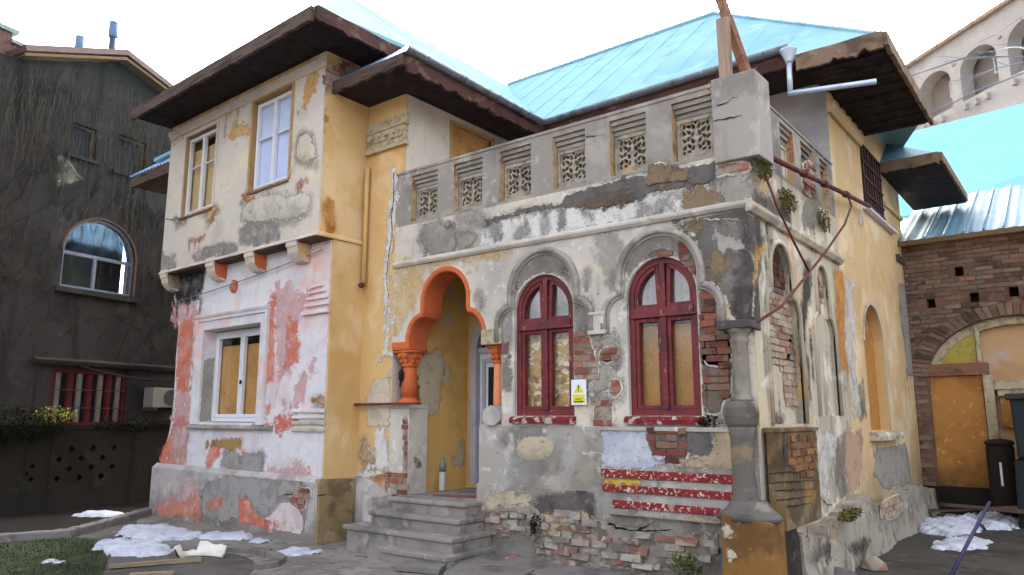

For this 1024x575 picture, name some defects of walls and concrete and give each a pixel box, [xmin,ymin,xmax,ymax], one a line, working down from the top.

spalling [301,60,356,110]
crack [708,88,742,122]
spalling [152,301,312,535]
peeling [252,280,324,438]
crack [384,173,394,344]
peeling [357,166,454,495]
spalling [478,160,799,416]
peeling [573,327,732,486]
spalling [786,269,911,522]
spalling [481,488,737,571]
crack [607,522,672,532]